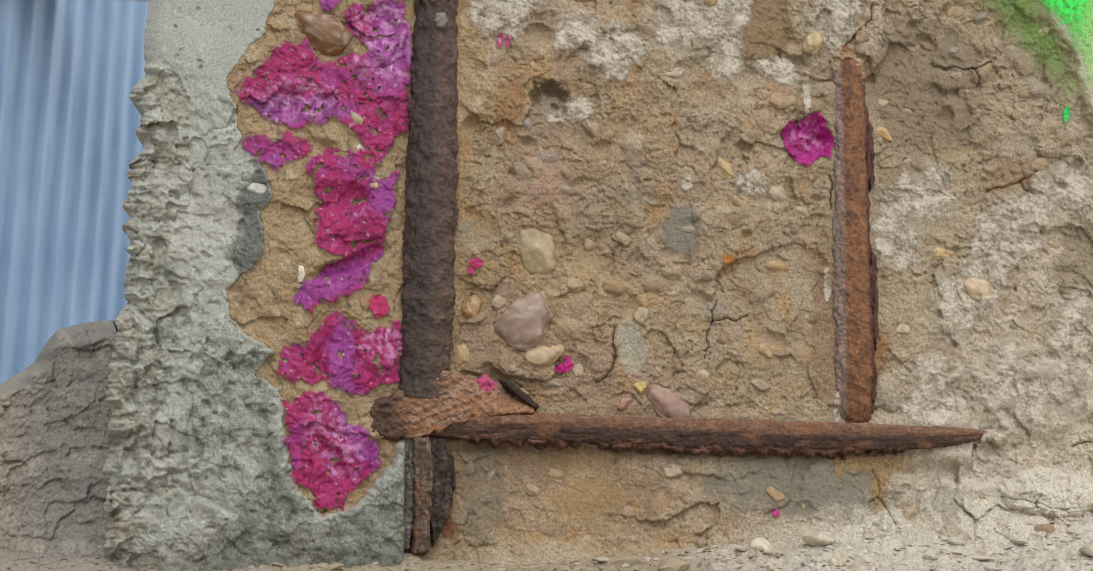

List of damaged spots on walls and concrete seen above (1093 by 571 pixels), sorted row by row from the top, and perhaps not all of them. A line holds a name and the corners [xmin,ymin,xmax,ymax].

rust [866,119,875,192]
spalling [227,0,416,533]
crack [704,300,746,359]
spalling [403,0,1093,568]
rust [870,244,890,404]
rust [370,370,540,555]
rust [468,434,913,513]